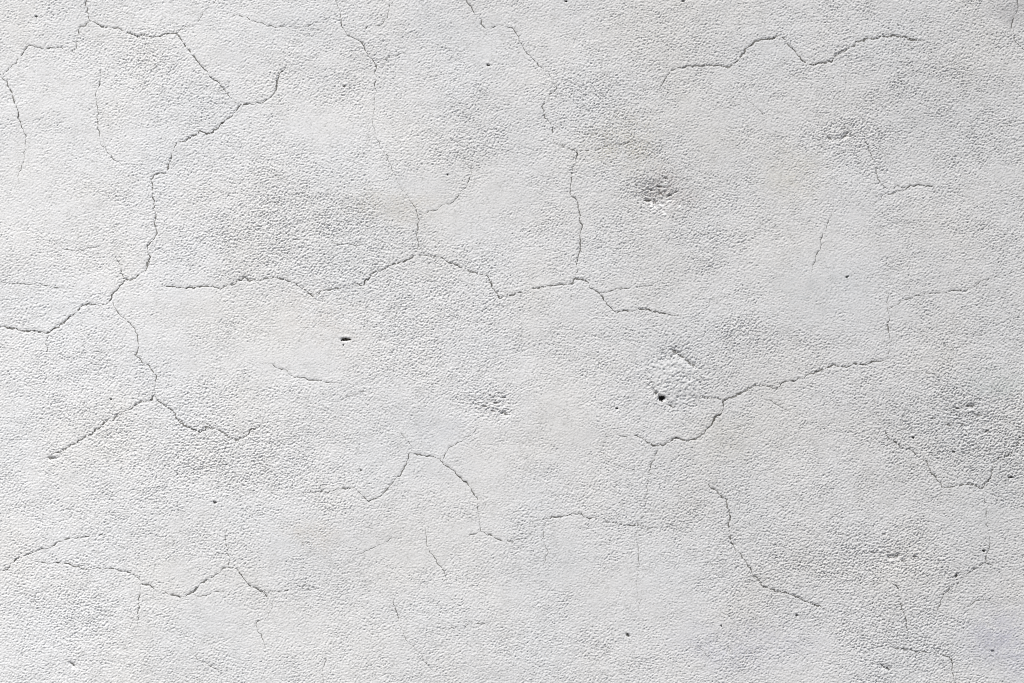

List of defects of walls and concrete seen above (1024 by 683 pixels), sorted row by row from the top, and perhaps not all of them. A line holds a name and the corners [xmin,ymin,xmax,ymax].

crack [659,34,925,90]
crack [864,126,949,204]
crack [2,0,678,454]
crack [303,271,1021,611]
crack [4,533,309,648]
crack [881,582,954,679]